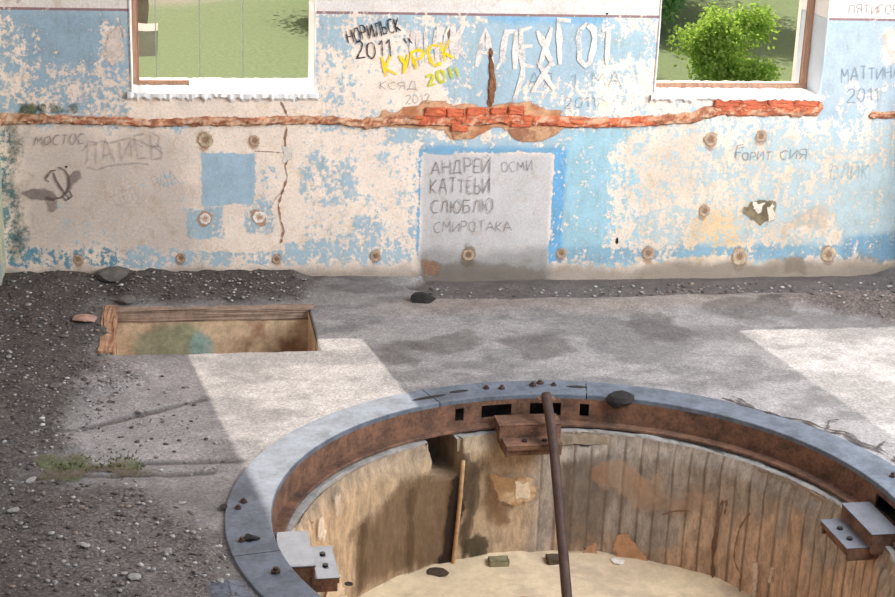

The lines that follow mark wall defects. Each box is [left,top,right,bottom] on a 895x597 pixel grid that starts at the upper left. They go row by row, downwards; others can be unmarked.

peeling [101,25,126,66]
flaking render [378,100,584,142]
flaking render [713,99,823,114]
crack [255,102,292,243]
flaking render [743,200,777,225]
crack [722,396,895,459]